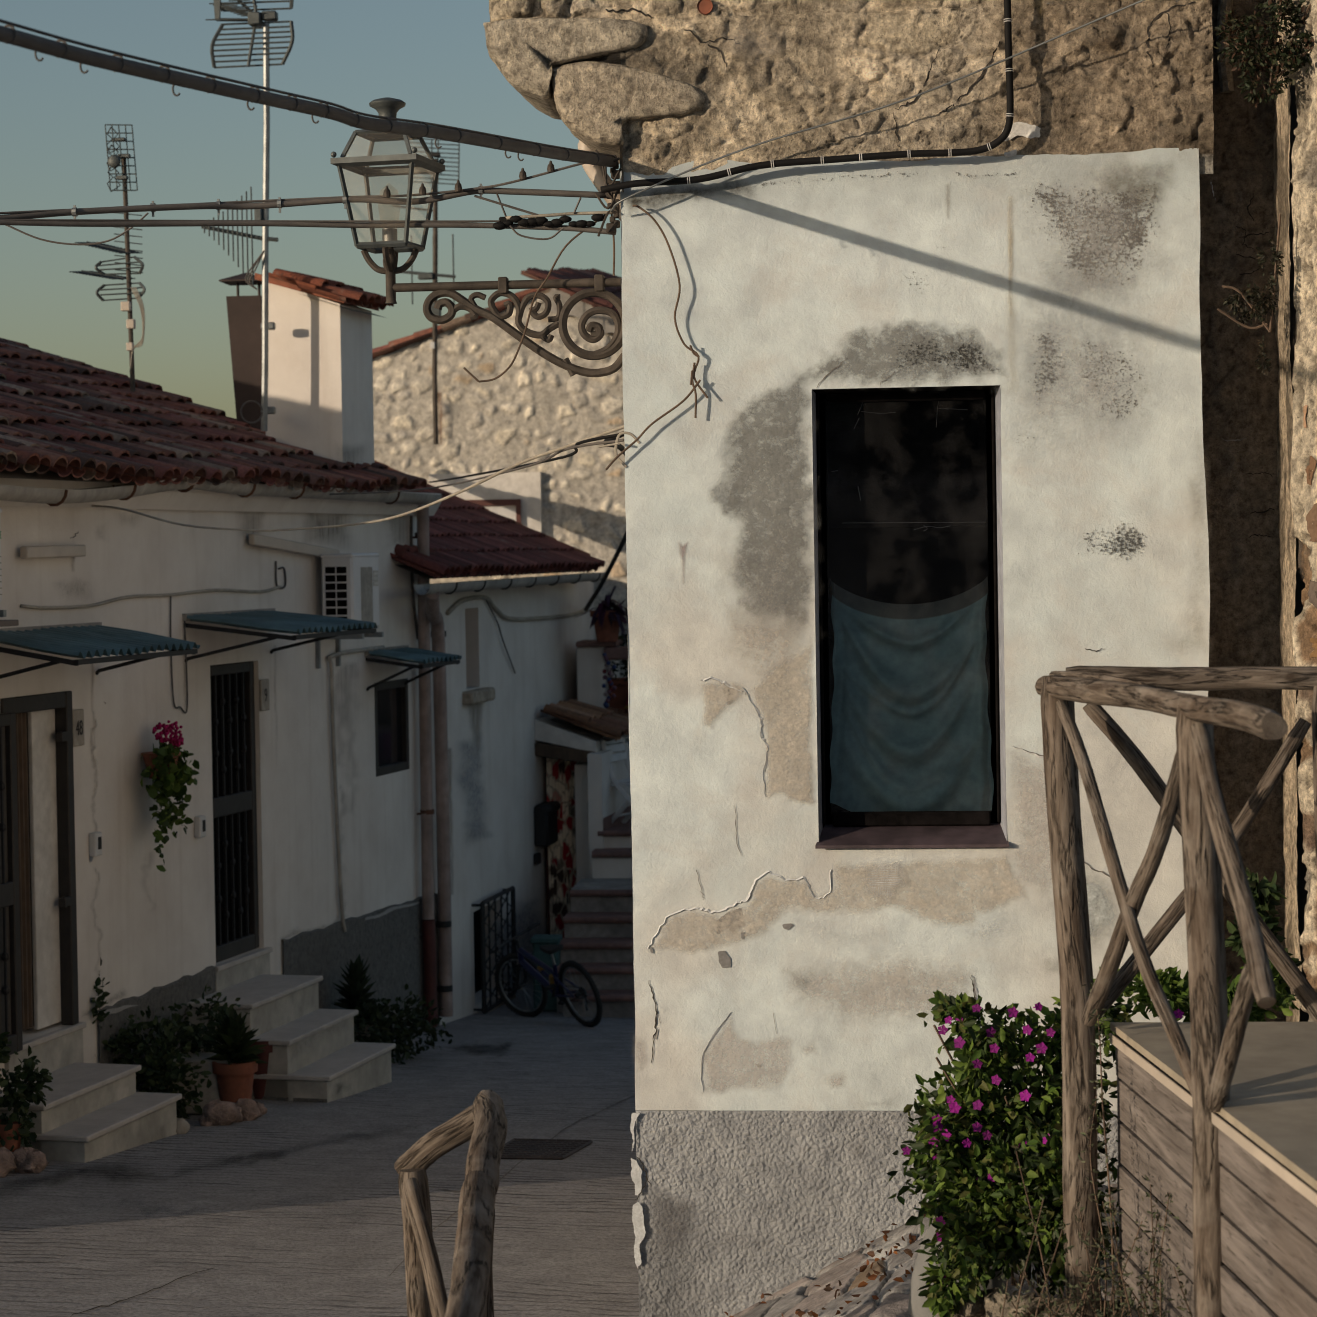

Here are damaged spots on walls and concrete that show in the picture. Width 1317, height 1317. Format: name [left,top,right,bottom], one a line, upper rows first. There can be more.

crack [606,8,652,19]
crack [684,29,739,67]
leakage [1025,176,1167,288]
leakage [1033,332,1145,418]
leakage [723,325,994,619]
leakage [1084,521,1147,560]
peeling [701,650,811,801]
flaking render [717,908,745,939]
flaking render [718,951,731,968]
crack [72,1268,213,1315]